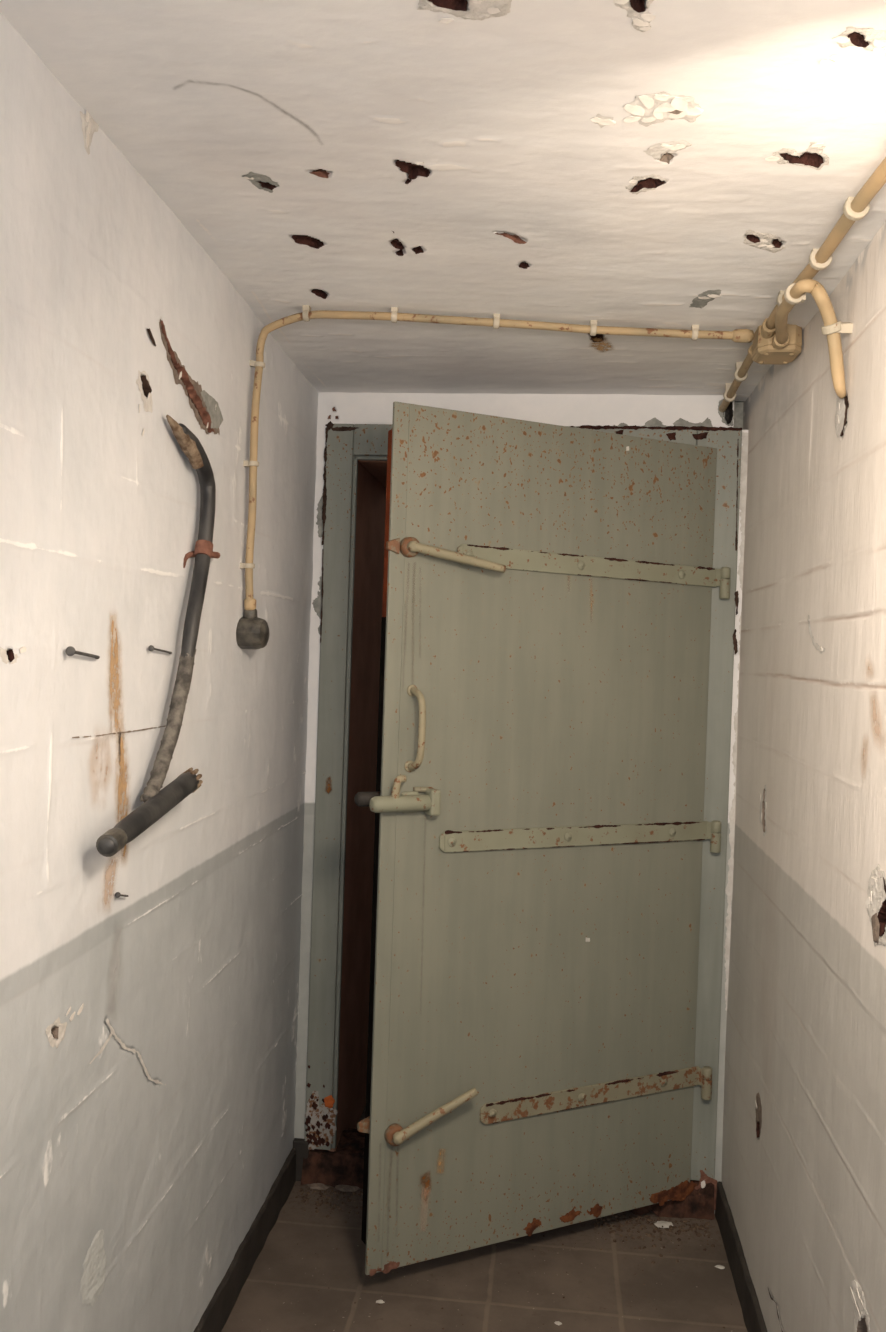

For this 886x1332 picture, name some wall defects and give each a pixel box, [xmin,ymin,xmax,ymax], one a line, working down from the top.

spalling [417,0,512,24]
spalling [613,0,656,32]
spalling [820,26,886,66]
spalling [242,172,279,193]
spalling [395,160,430,184]
peeling [625,140,692,195]
spalling [765,142,829,170]
rust [110,620,128,821]
spalling [865,864,886,946]
crack [89,1018,166,1085]
rust [305,1065,338,1150]
rust [649,1170,718,1210]